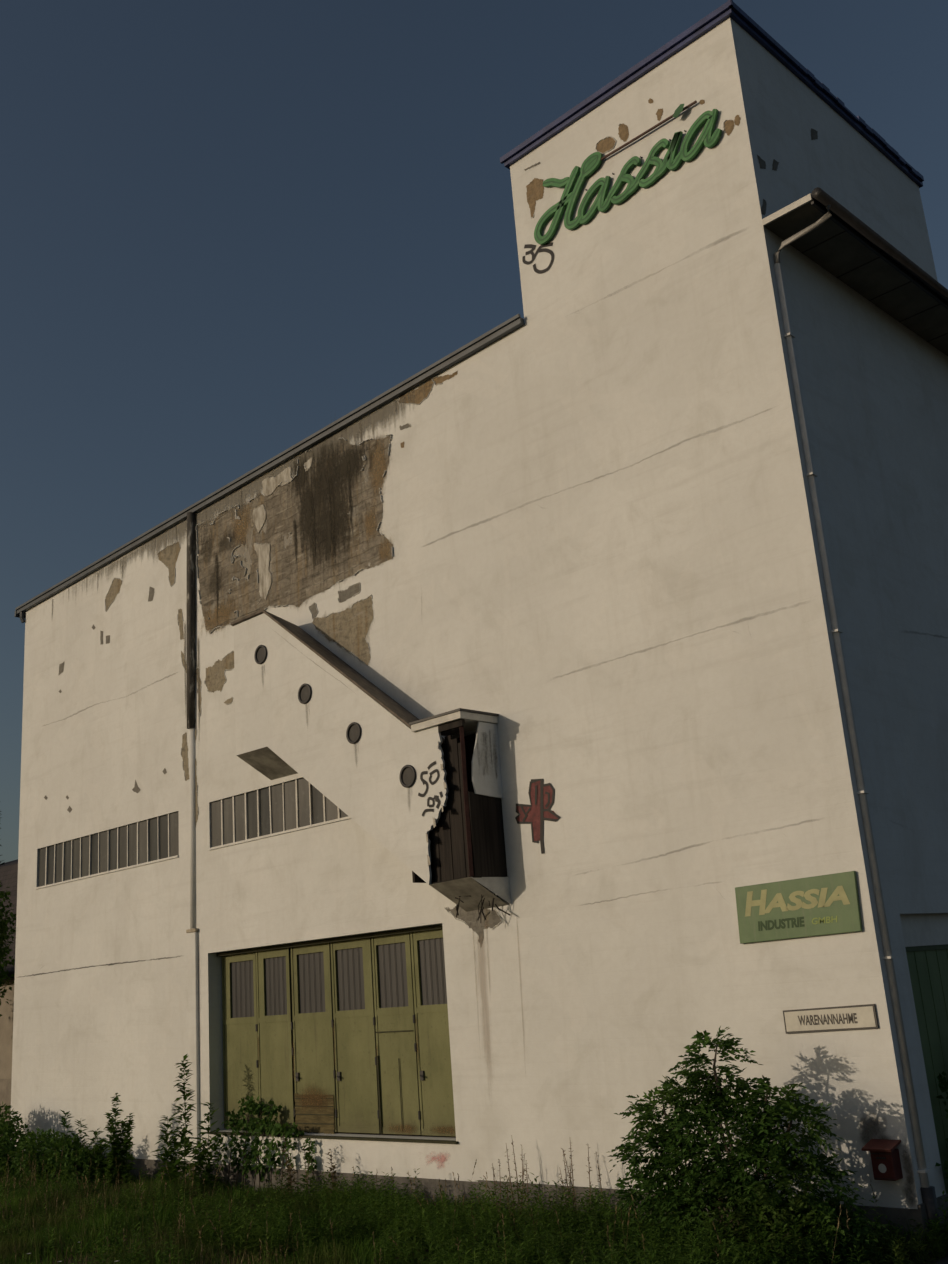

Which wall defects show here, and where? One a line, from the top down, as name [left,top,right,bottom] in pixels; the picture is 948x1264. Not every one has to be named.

flaking render [595,124,629,154]
flaking render [723,115,740,136]
flaking render [524,162,544,218]
flaking render [398,371,457,405]
flaking render [157,541,181,587]
water stain [97,394,410,717]
flaking render [196,423,411,666]
flaking render [105,578,122,612]
flaking render [177,609,234,826]